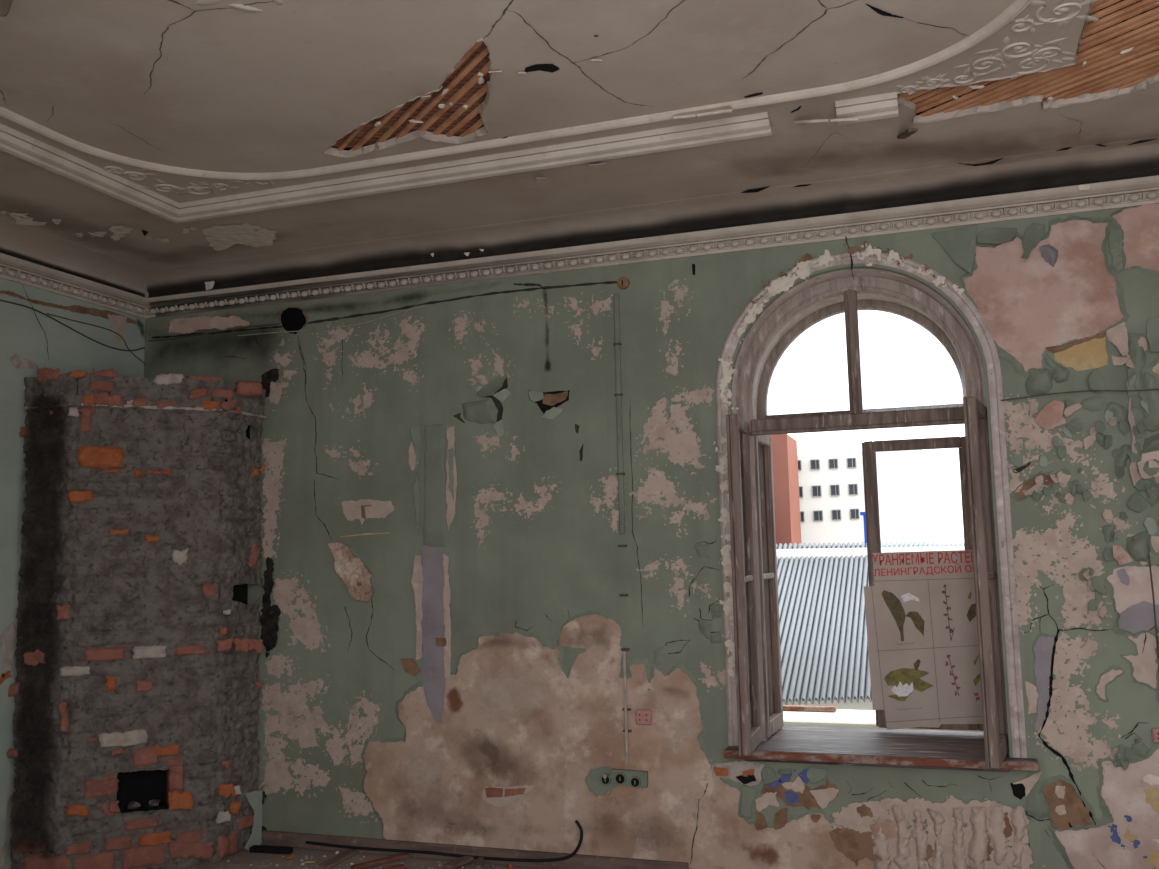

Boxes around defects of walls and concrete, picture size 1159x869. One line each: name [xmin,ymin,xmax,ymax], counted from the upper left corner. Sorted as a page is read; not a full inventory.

crack [144,0,274,94]
flaking render [323,38,502,158]
crack [484,0,685,107]
crack [744,0,857,78]
flaking render [897,0,1159,124]
peeling [0,211,61,226]
peeling [146,221,276,251]
peeling [733,250,834,344]
flaking render [259,279,876,869]
flaking render [843,203,1159,869]
flaking render [0,622,17,685]
crack [1025,584,1113,825]